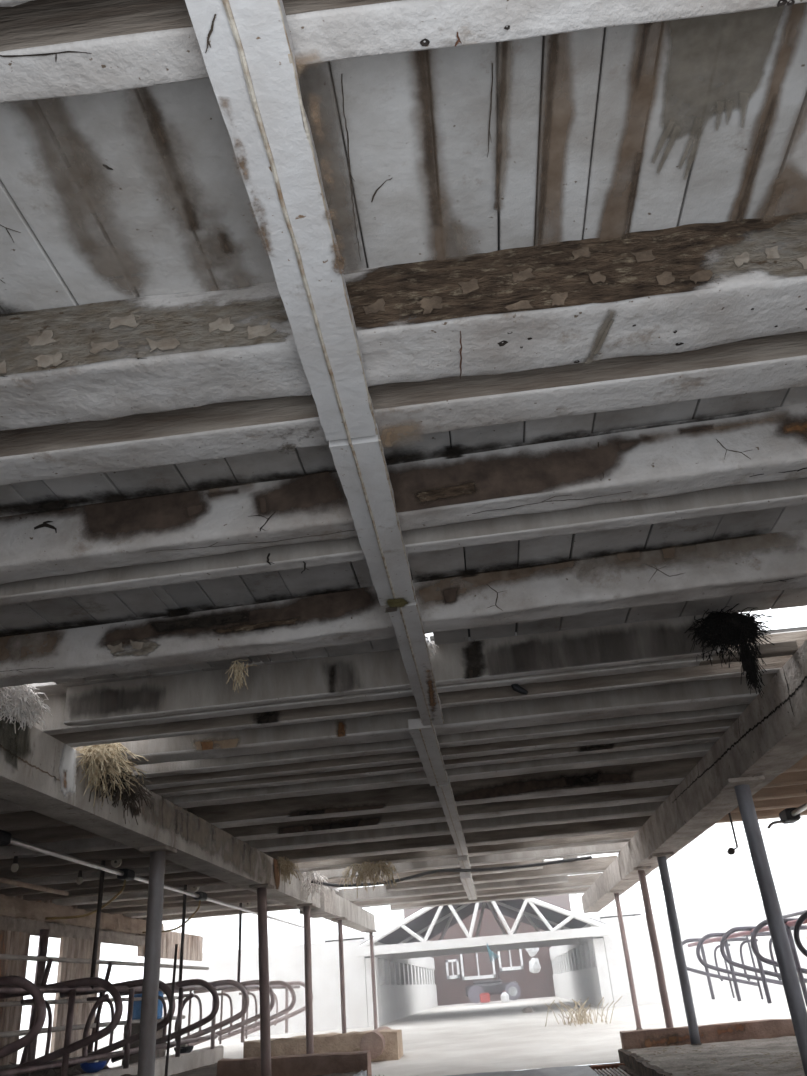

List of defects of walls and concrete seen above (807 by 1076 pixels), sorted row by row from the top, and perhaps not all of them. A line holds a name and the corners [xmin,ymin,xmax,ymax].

damp [598,2,807,241]
damp [18,98,143,295]
damp [133,87,251,291]
peeling [345,213,807,330]
peeling [0,298,289,376]
crack [716,439,807,477]
spalling [107,640,159,656]